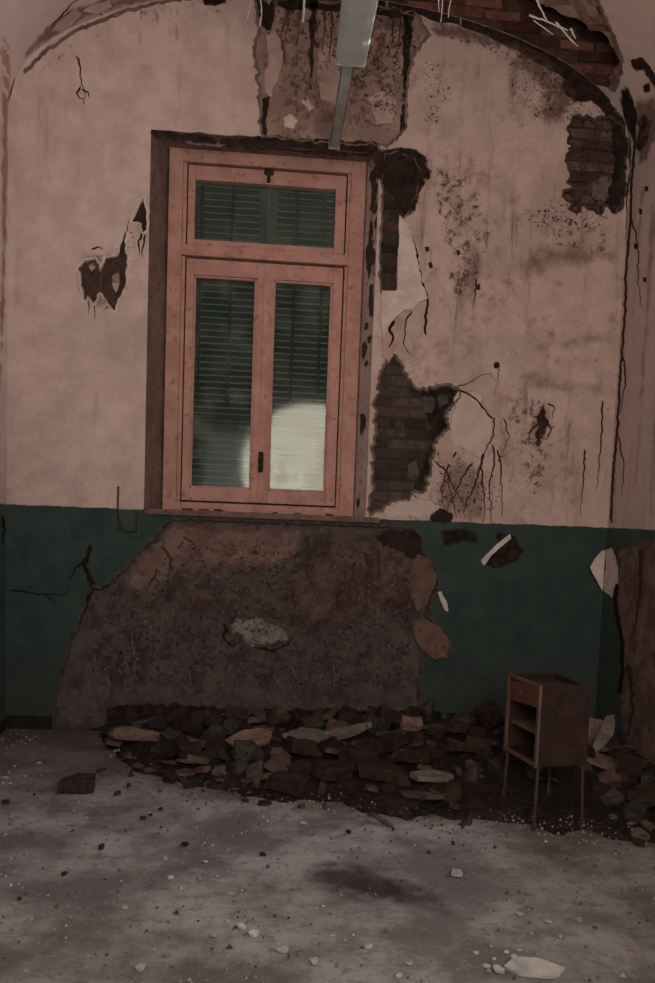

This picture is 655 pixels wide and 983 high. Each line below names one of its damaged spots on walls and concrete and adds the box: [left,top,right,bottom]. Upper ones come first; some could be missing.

flaking render [51,0,631,730]
leakage [384,400,554,524]
leakage [596,401,604,488]
flaking render [590,539,655,765]